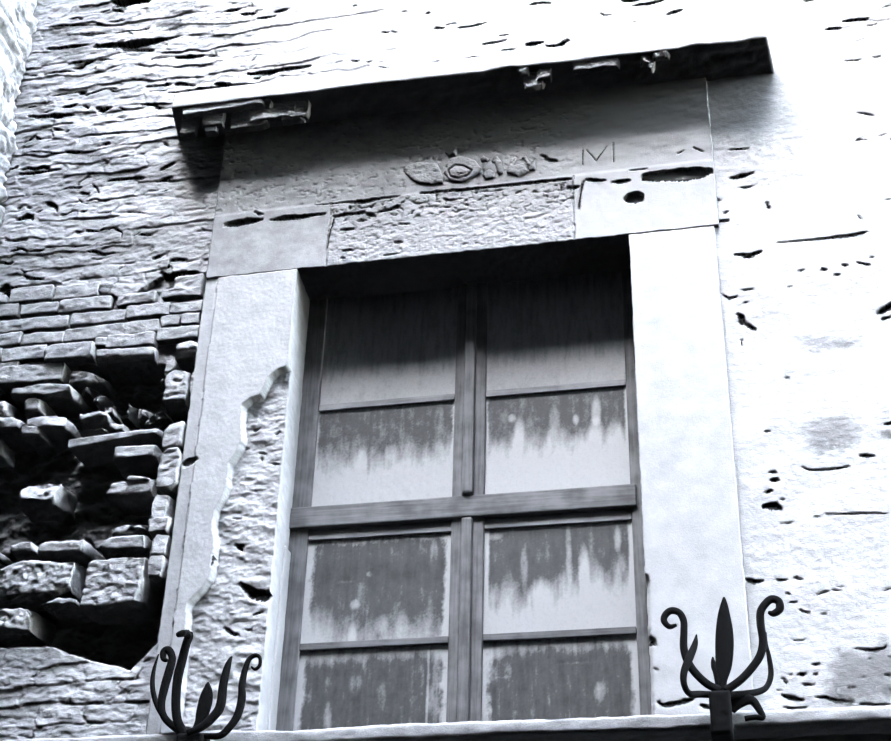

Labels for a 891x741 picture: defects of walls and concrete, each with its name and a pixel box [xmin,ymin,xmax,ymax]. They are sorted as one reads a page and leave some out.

spalling [0,341,198,648]